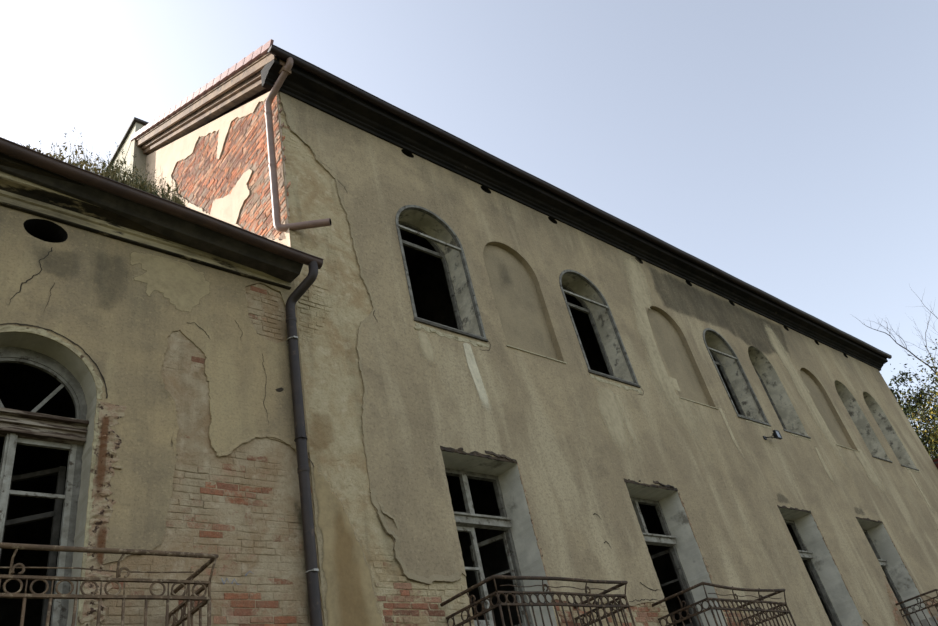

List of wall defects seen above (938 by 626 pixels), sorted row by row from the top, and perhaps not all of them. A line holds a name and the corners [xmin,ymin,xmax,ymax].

crack [279,93,378,322]
crack [9,248,55,308]
flaking render [130,252,210,312]
flaking render [172,91,475,626]
peeling [414,322,490,348]
peeling [590,374,643,395]
flaking render [0,323,310,626]
flaking render [440,446,673,626]
flaking render [701,605,762,626]
flaking render [856,517,938,626]